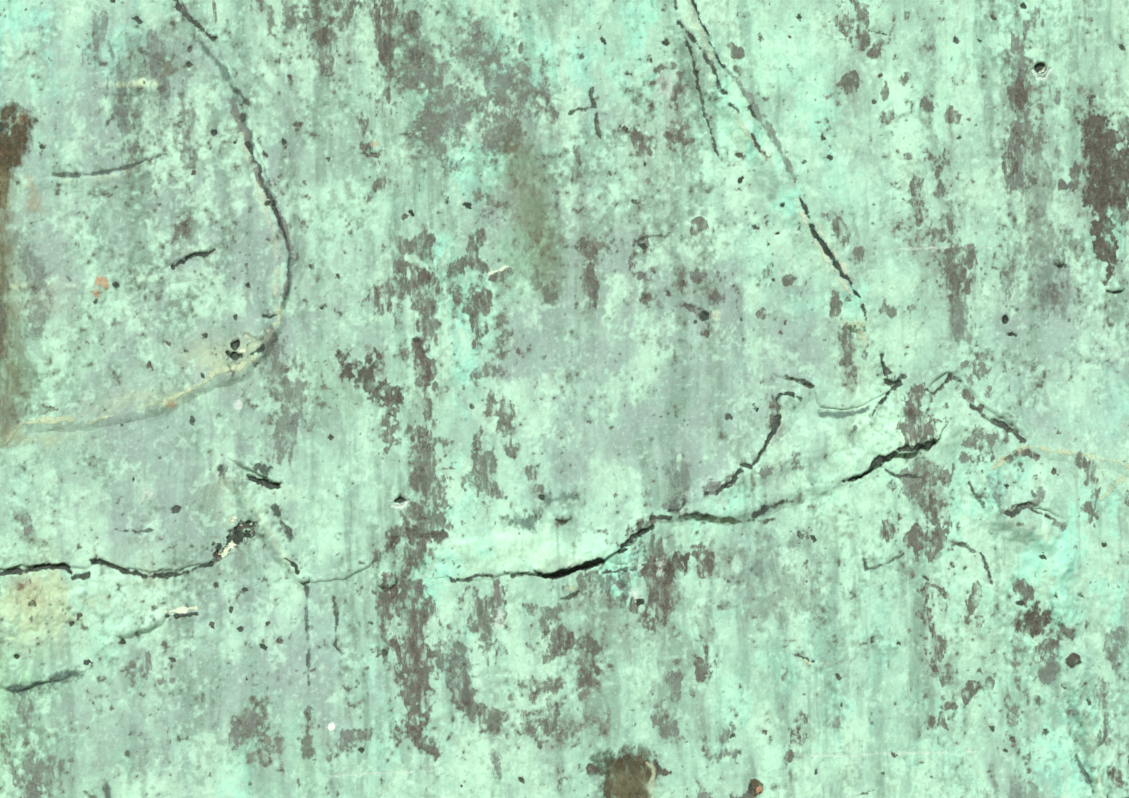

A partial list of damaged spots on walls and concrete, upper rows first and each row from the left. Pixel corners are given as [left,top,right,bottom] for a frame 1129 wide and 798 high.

crack [174,0,217,36]
crack [54,155,161,177]
crack [674,0,867,320]
crack [230,87,294,355]
rust [0,102,38,428]
crack [171,248,216,269]
crack [210,463,281,490]
crack [449,354,1067,584]
crack [0,558,214,580]
crack [7,670,82,695]
rust [586,747,672,798]